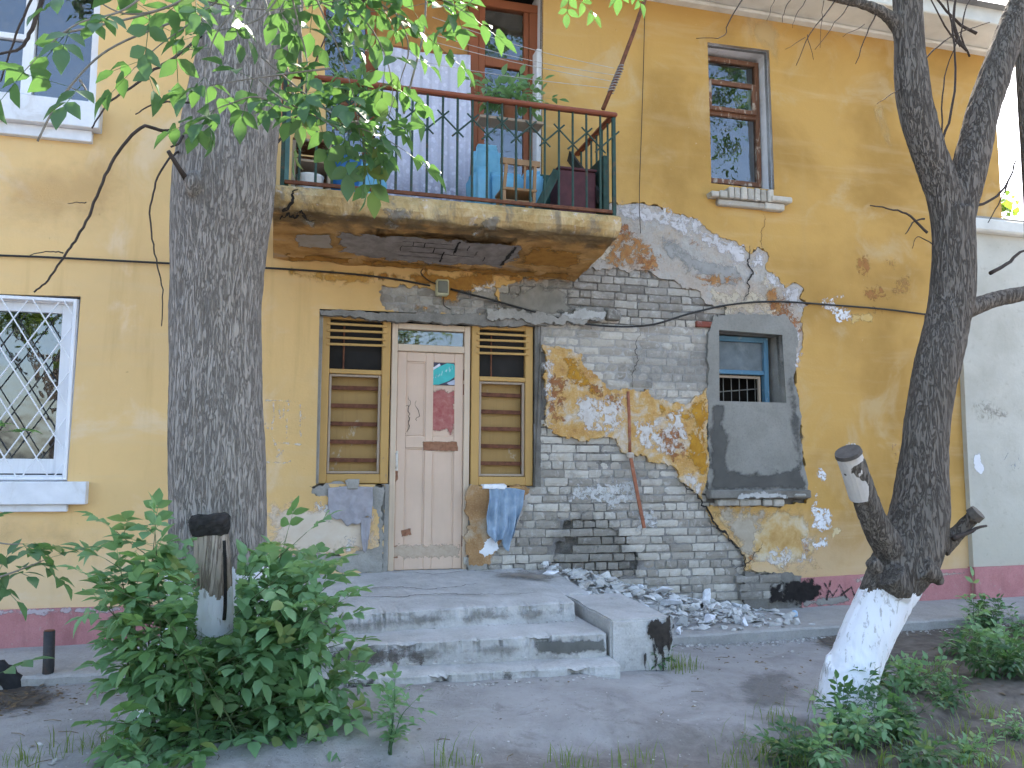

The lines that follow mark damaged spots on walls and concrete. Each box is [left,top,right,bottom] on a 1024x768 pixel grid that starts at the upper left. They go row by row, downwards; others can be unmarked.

crack [279,189,314,222]
spalling [295,208,522,268]
peeling [822,296,873,323]
flaking render [379,203,807,610]
corrosion [626,452,646,528]
peeling [269,502,374,554]
peeling [794,493,841,550]